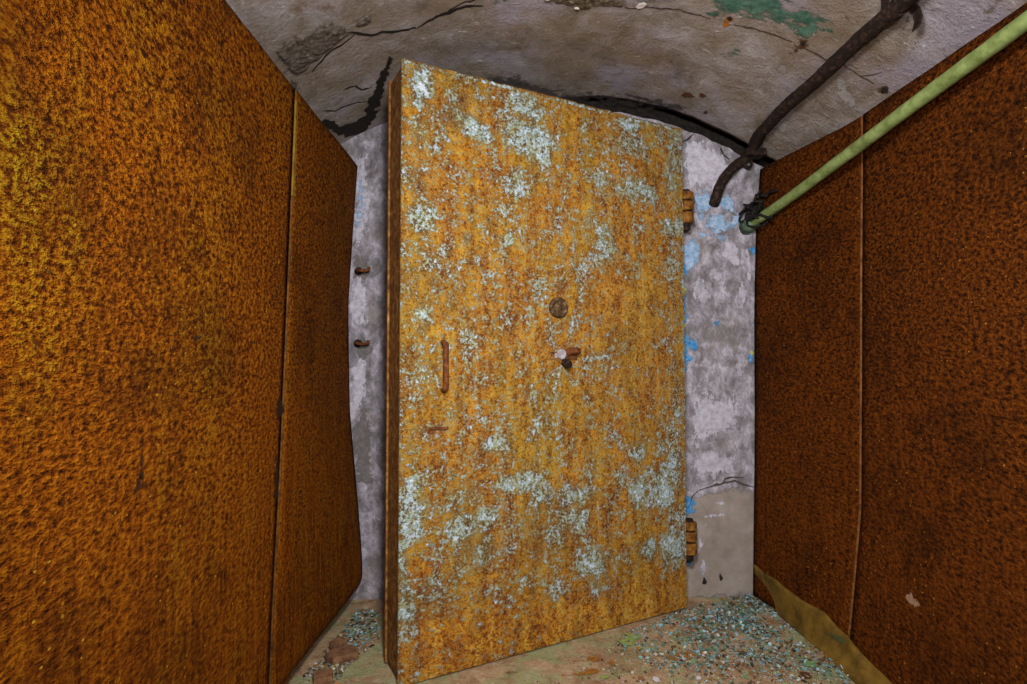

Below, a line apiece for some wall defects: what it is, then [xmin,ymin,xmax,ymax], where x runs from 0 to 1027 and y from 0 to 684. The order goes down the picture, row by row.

spalling [545,0,670,10]
peeling [706,0,833,38]
crack [312,0,484,137]
peeling [683,139,755,371]
peeling [731,345,754,376]
peeling [690,388,743,482]
corrosion [573,656,615,676]